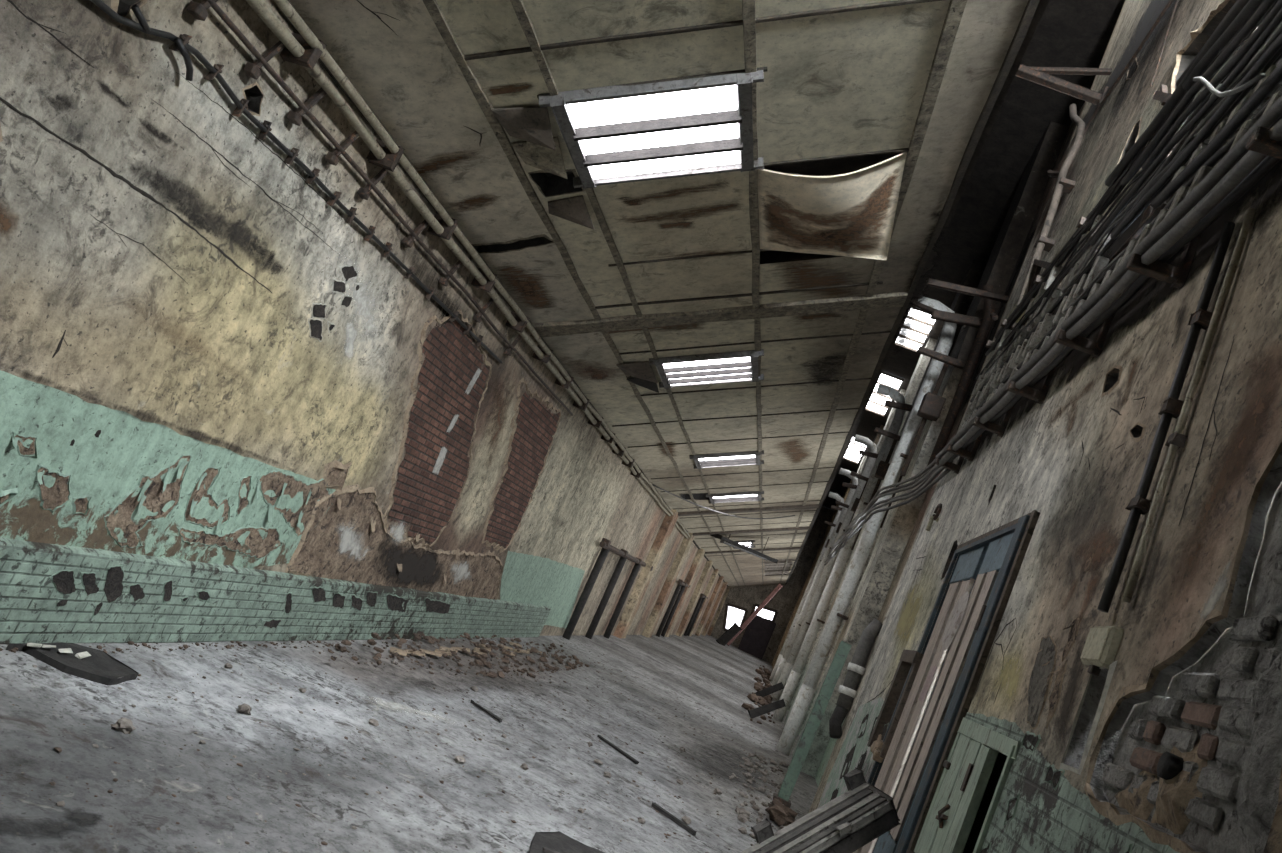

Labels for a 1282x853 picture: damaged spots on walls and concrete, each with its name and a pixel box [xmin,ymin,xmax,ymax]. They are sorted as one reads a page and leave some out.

crack [7,0,93,67]
spalling [1171,0,1237,94]
crack [0,97,272,293]
crack [153,72,355,252]
leakage [620,183,738,229]
peeling [0,488,18,507]
peeling [12,432,92,515]
flaking render [104,309,561,615]
peeling [49,565,146,618]
peeling [261,592,292,629]
flaking render [1084,442,1282,853]